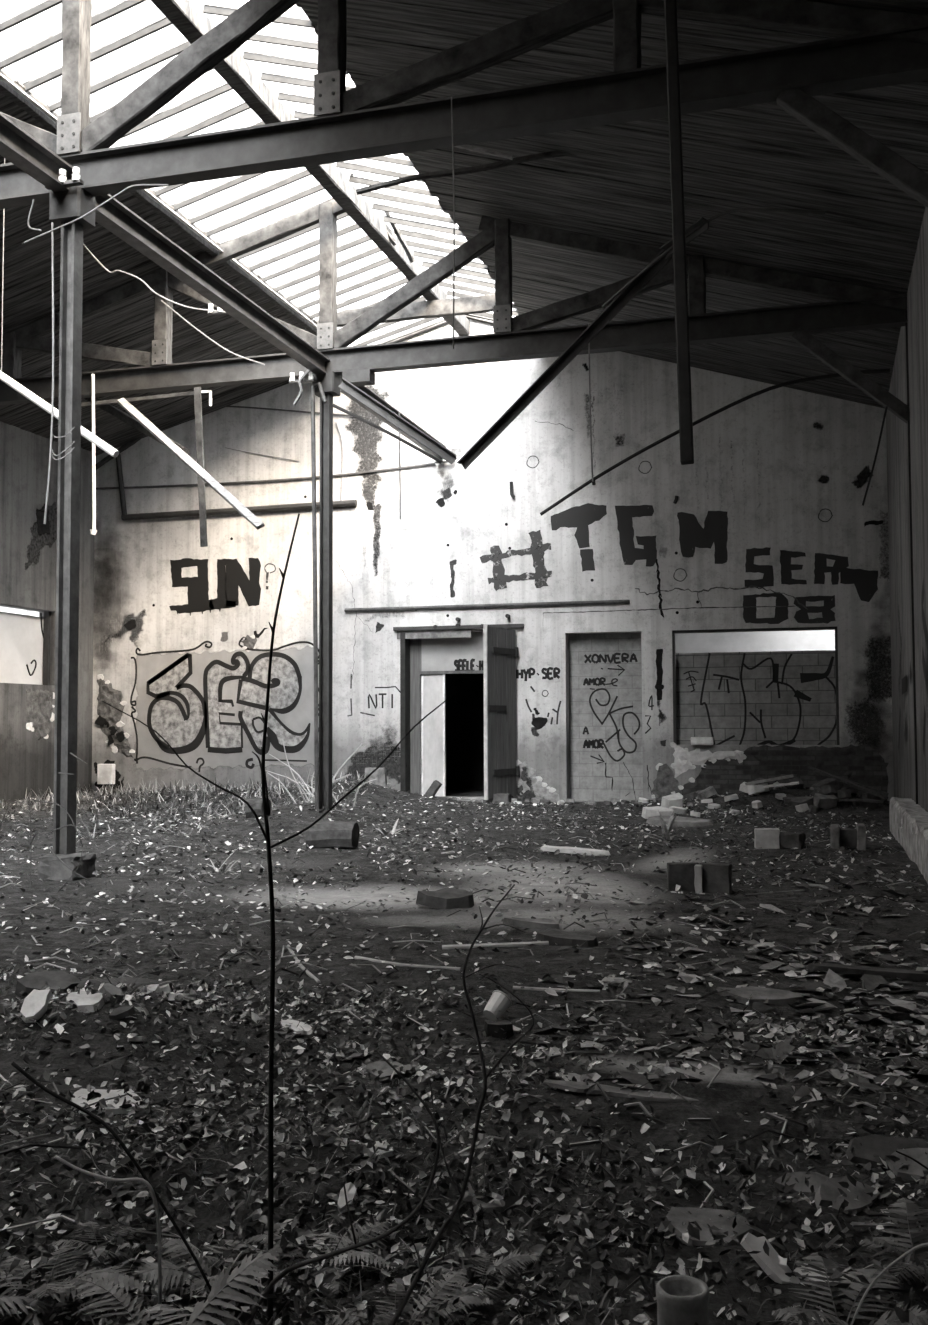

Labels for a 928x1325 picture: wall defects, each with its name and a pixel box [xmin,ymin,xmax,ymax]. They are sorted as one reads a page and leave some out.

leakage [345,400,384,575]
spalling [97,674,135,758]
spalling [651,737,888,802]